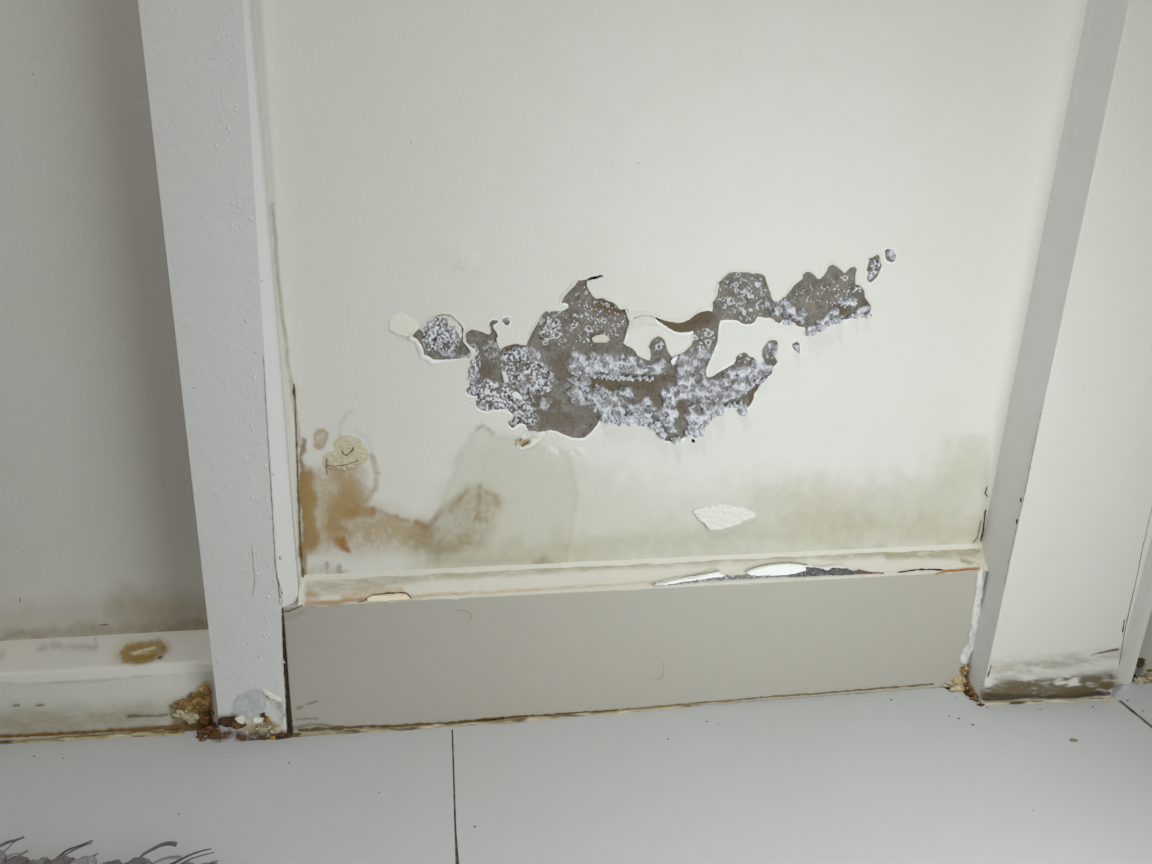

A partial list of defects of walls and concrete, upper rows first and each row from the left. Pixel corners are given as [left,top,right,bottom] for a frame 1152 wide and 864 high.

peeling [388,249,894,444]
peeling [693,504,757,530]
leakage [857,549,980,557]
peeling [654,562,884,586]
rust [120,640,167,663]
rust [941,664,985,706]
leakage [980,674,1116,701]
rust [168,683,301,741]